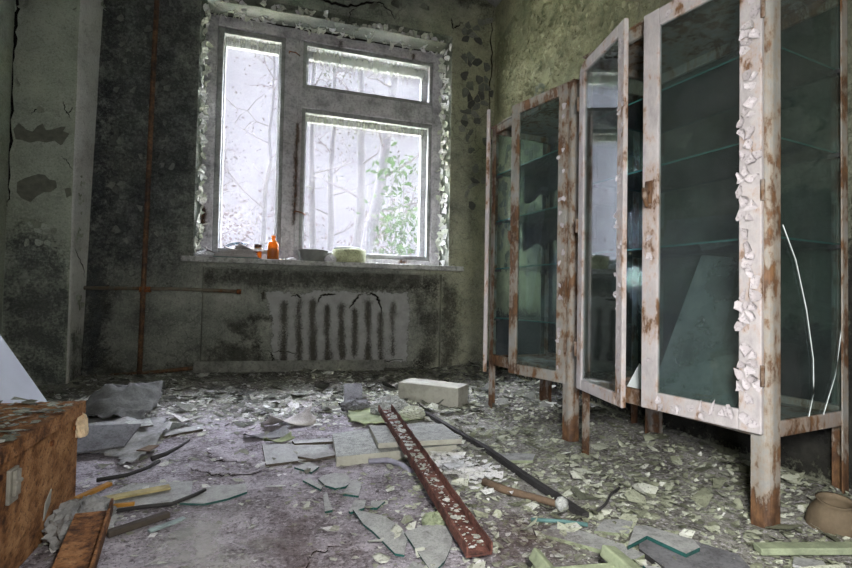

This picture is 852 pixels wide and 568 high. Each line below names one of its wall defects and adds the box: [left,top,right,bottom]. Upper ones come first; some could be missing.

crack [7,0,37,206]
peeling [13,123,69,145]
peeling [194,0,452,266]
crack [208,0,463,54]
crack [488,7,496,109]
peeling [458,0,647,154]
peeling [627,193,643,219]
crack [291,292,383,314]
water stain [663,301,739,387]
water stain [781,314,832,404]
water stain [663,412,751,454]
water stain [780,428,832,483]